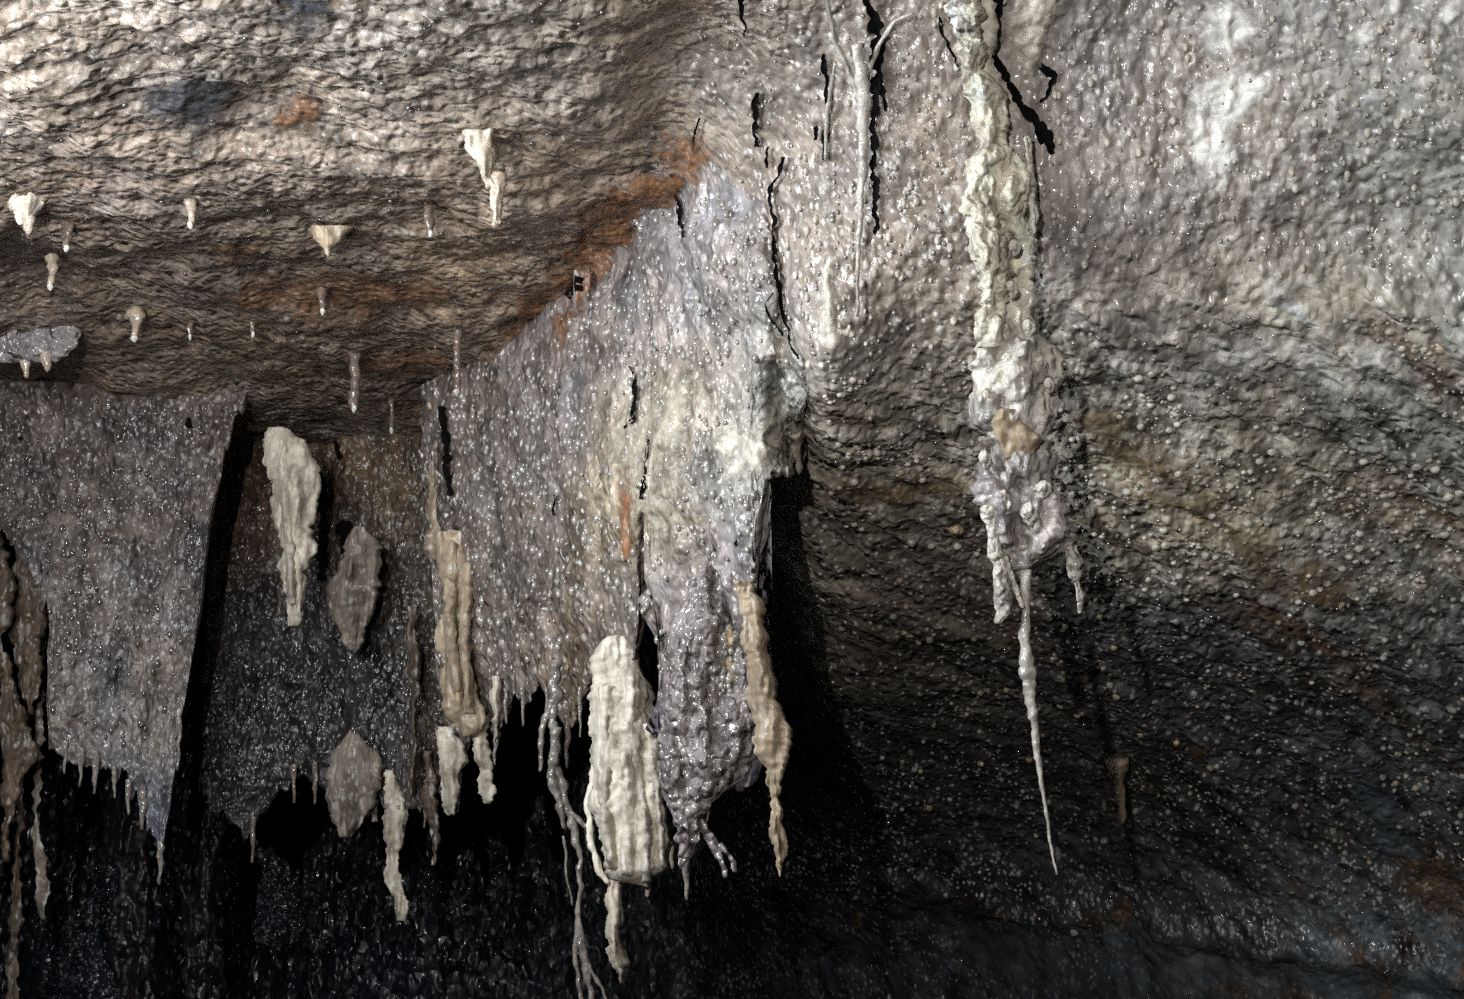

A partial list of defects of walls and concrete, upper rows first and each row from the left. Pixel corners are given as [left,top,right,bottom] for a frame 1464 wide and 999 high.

crack [738,0,747,36]
crack [862,0,887,235]
crack [938,0,1057,154]
efflorescence [980,0,1059,102]
corrosion [475,132,706,367]
crack [751,54,831,359]
efflorescence [607,364,691,554]
leakage [714,414,795,476]
leakage [36,865,120,999]
leakage [239,818,319,948]